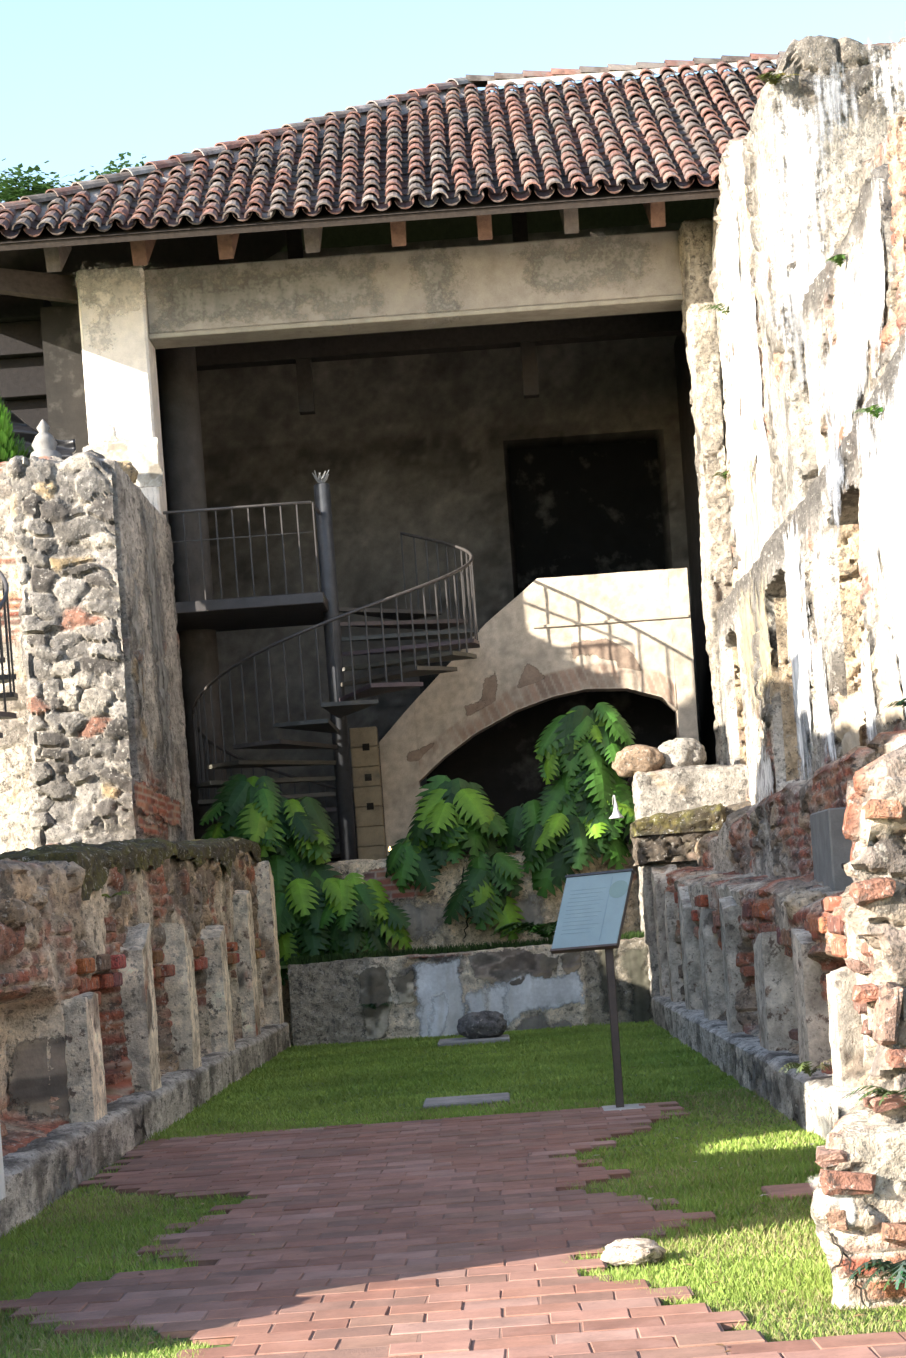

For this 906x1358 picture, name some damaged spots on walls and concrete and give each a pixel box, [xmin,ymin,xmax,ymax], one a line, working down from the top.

damp [721,67,857,777]
damp [822,186,906,711]
damp [862,644,877,740]